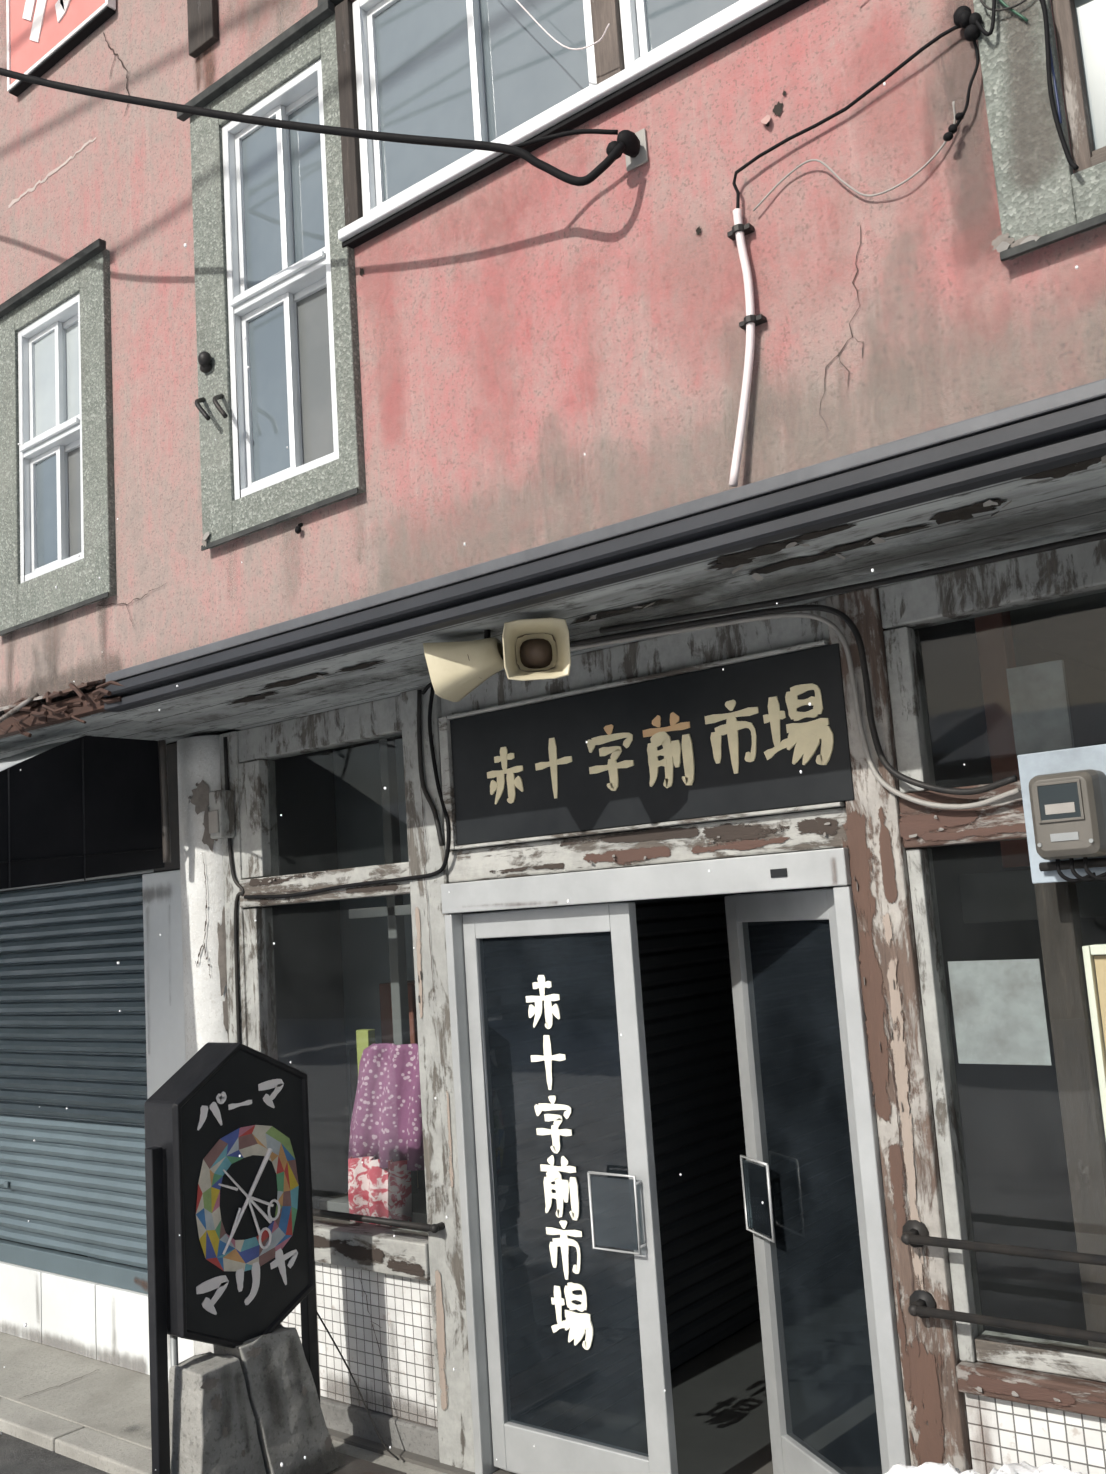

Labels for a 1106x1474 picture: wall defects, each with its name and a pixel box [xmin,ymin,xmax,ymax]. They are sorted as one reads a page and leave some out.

crack [819,225,864,429]
peeling [1021,455,1106,481]
peeling [704,499,1012,581]
peeling [188,780,218,852]
peeling [217,907,229,1043]
peeling [489,807,1026,1466]
peeling [966,1371,1106,1408]